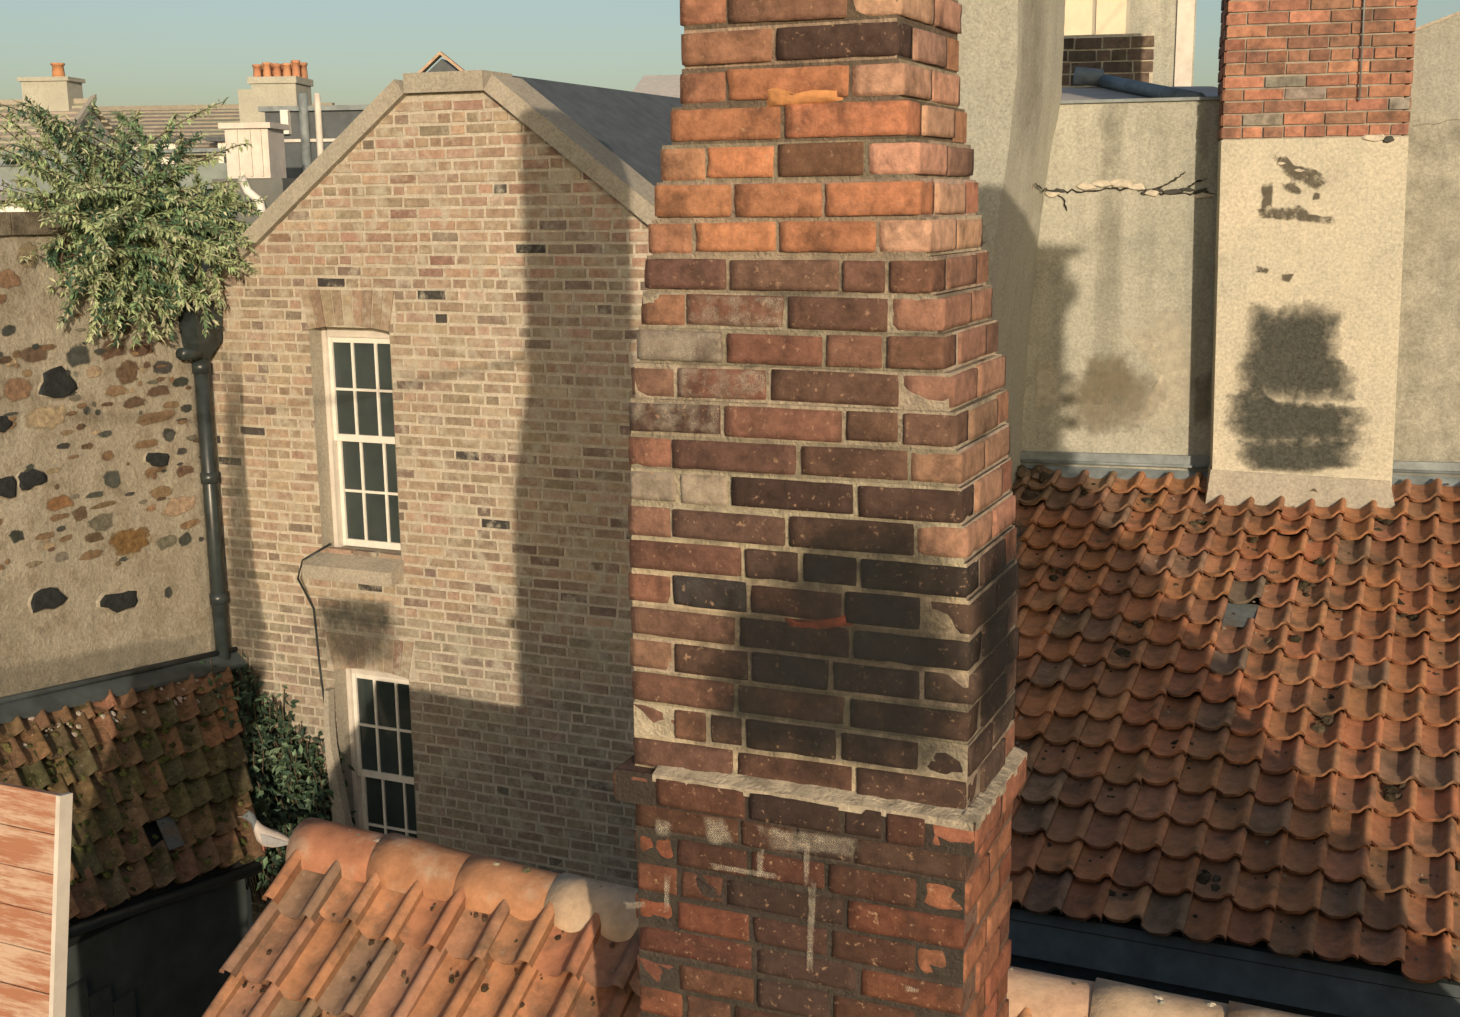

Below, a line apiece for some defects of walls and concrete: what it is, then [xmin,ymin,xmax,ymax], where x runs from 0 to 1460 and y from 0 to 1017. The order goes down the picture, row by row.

crack [1035,172,1217,213]
spalling [1259,157,1331,223]
spalling [1258,267,1293,282]
damp [1037,331,1185,425]